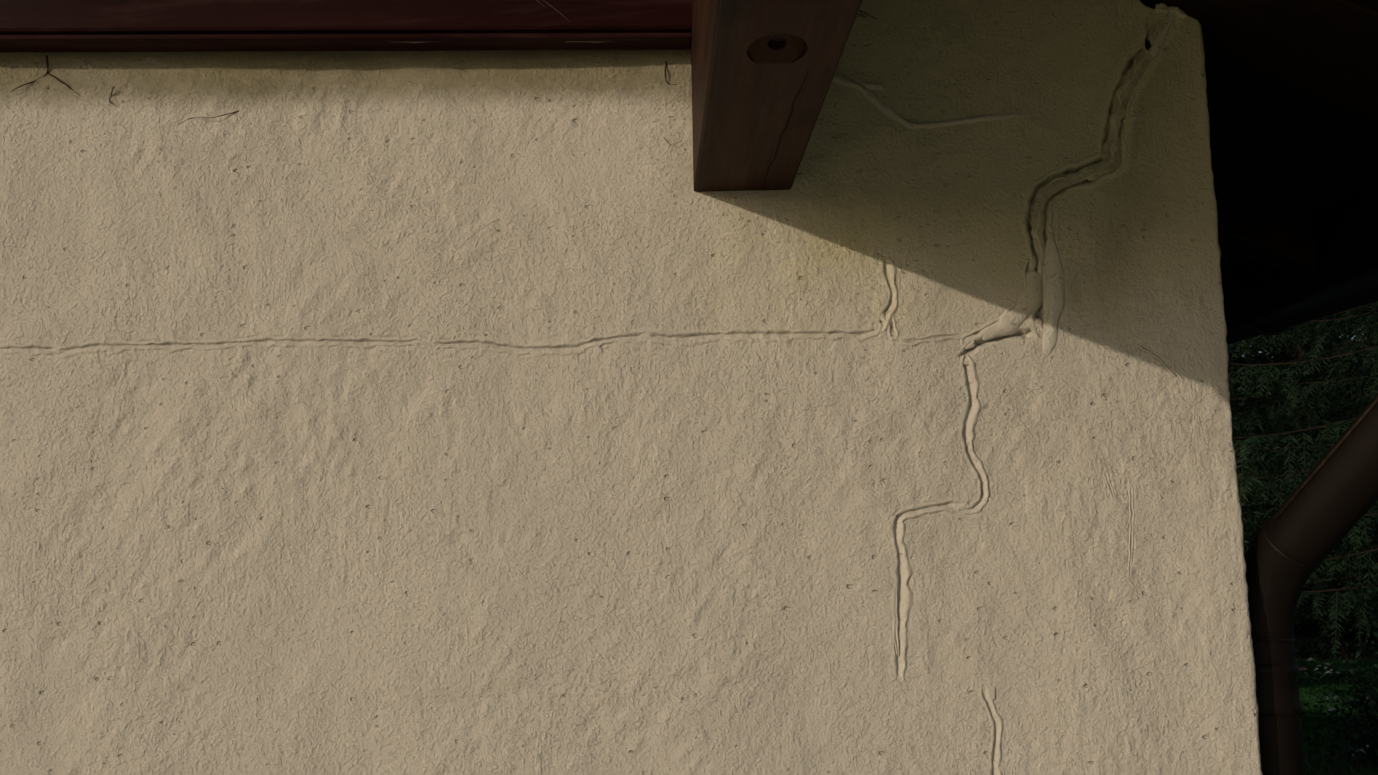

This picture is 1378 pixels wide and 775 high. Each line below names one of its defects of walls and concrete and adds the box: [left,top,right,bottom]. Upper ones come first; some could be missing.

crack [0,12,1185,682]
crack [978,685,1016,775]